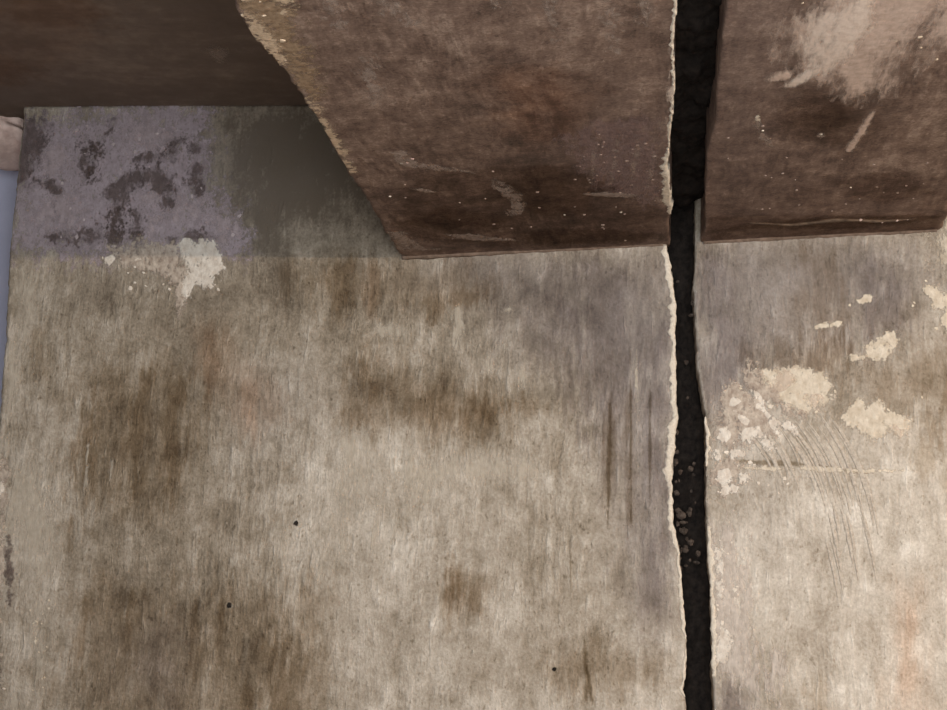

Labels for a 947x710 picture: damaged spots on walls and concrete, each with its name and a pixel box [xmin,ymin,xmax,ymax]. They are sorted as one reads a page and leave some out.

crack [659,0,722,710]